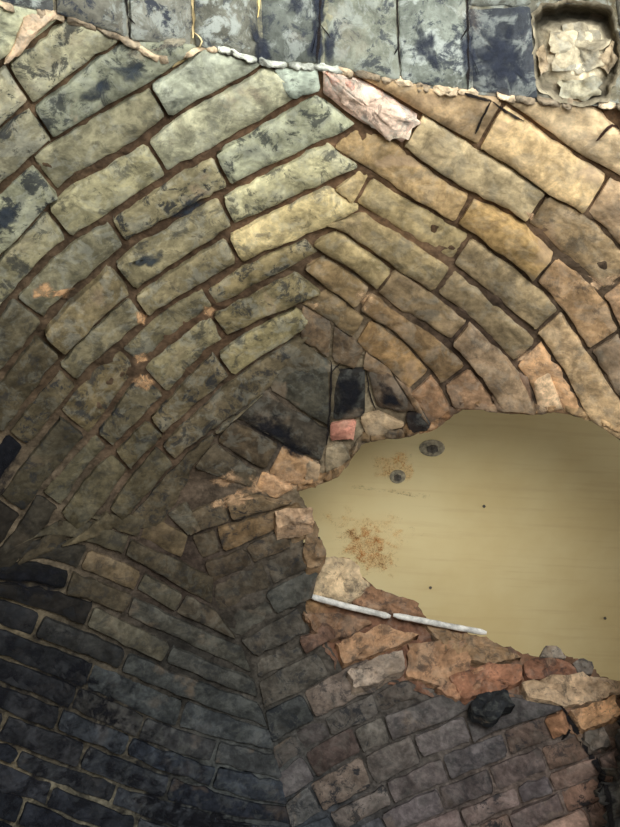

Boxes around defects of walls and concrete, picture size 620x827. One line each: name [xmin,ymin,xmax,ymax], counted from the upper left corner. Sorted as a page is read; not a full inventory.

spalling [213,401,465,508]
spalling [475,400,591,421]
spalling [274,507,620,758]